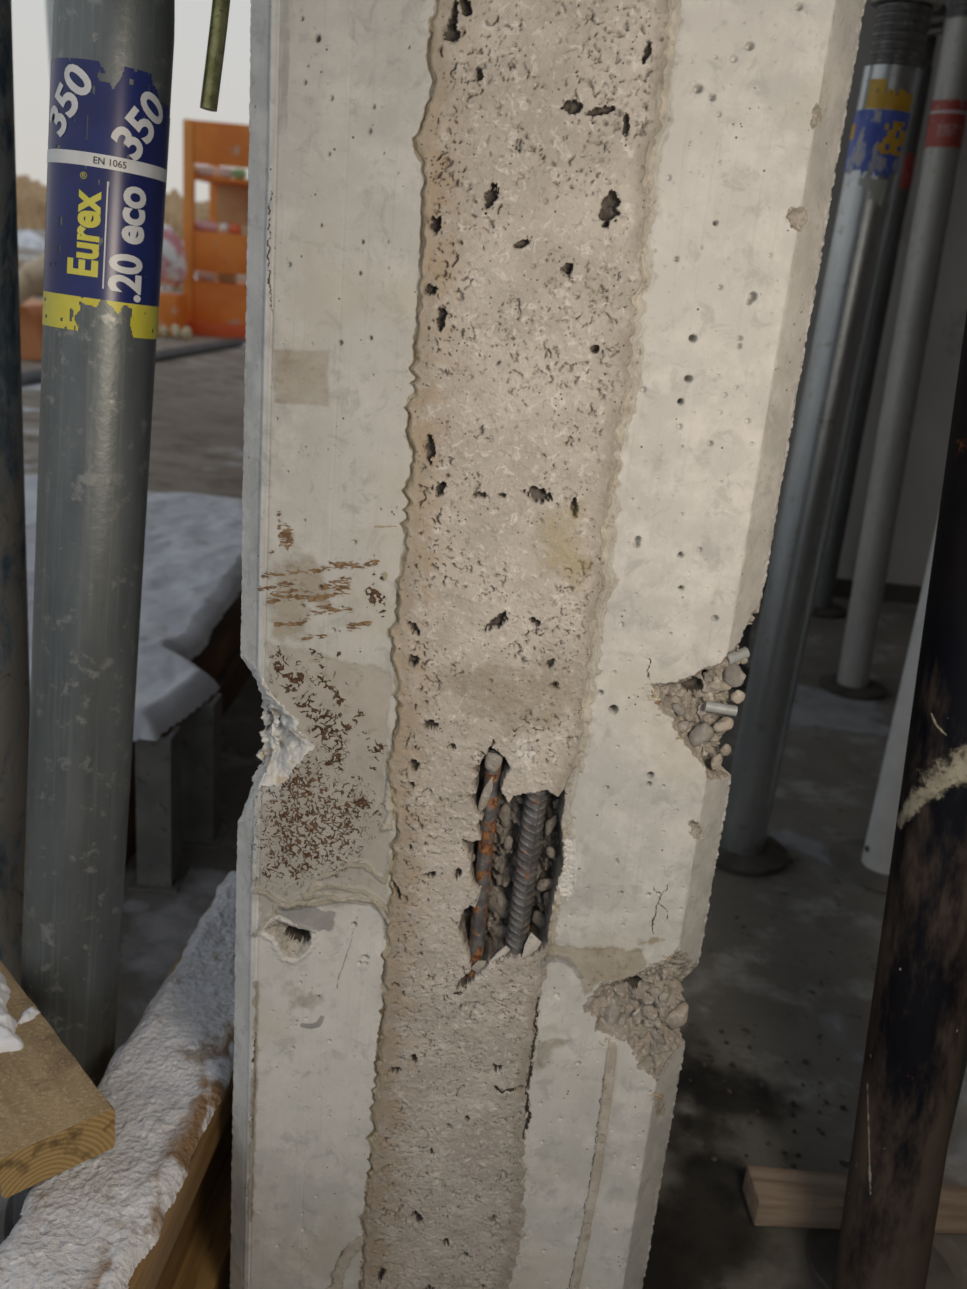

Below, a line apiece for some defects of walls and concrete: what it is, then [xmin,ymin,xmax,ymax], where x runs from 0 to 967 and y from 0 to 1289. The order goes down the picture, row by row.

rust [258,511,387,640]
spalling [238,654,315,822]
spalling [649,596,762,781]
spalling [457,740,565,989]
crack [494,997,540,1140]
spalling [583,947,699,1099]